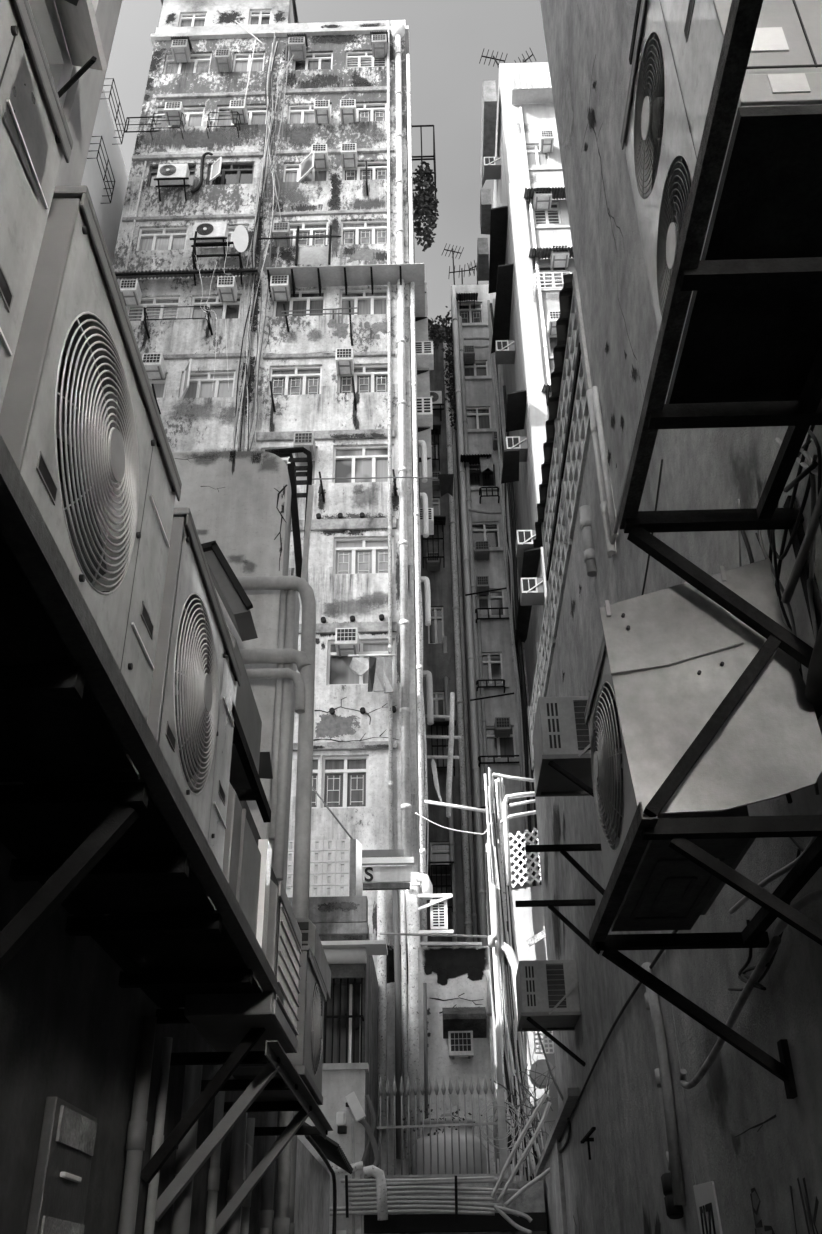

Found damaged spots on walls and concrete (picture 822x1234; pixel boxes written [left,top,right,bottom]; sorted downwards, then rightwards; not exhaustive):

damp [307,23,385,45]
damp [282,43,374,89]
damp [134,108,260,155]
damp [286,126,312,147]
damp [359,125,386,141]
damp [209,197,265,268]
damp [327,173,387,257]
damp [249,280,262,332]
damp [288,330,321,341]
damp [170,347,257,424]